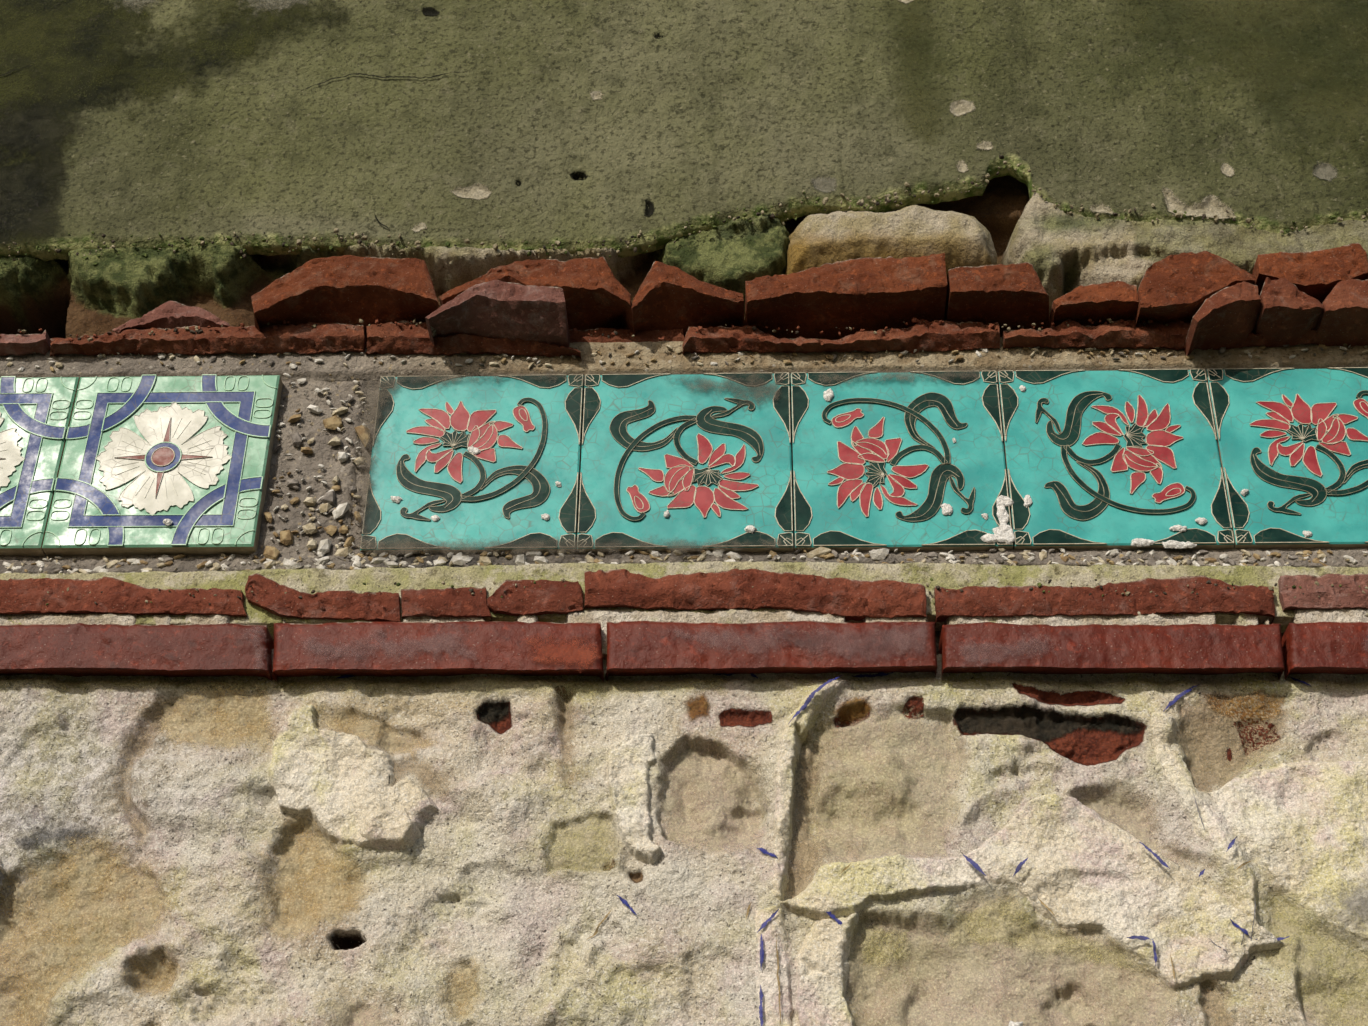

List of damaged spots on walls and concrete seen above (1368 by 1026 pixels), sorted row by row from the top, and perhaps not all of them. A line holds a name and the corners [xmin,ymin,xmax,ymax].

damp [0,95,80,243]
spalling [569,171,588,180]
spalling [452,184,492,199]
spalling [644,199,654,216]
spalling [1090,204,1113,214]
spalling [1162,188,1236,219]
peeling [718,678,1368,1026]